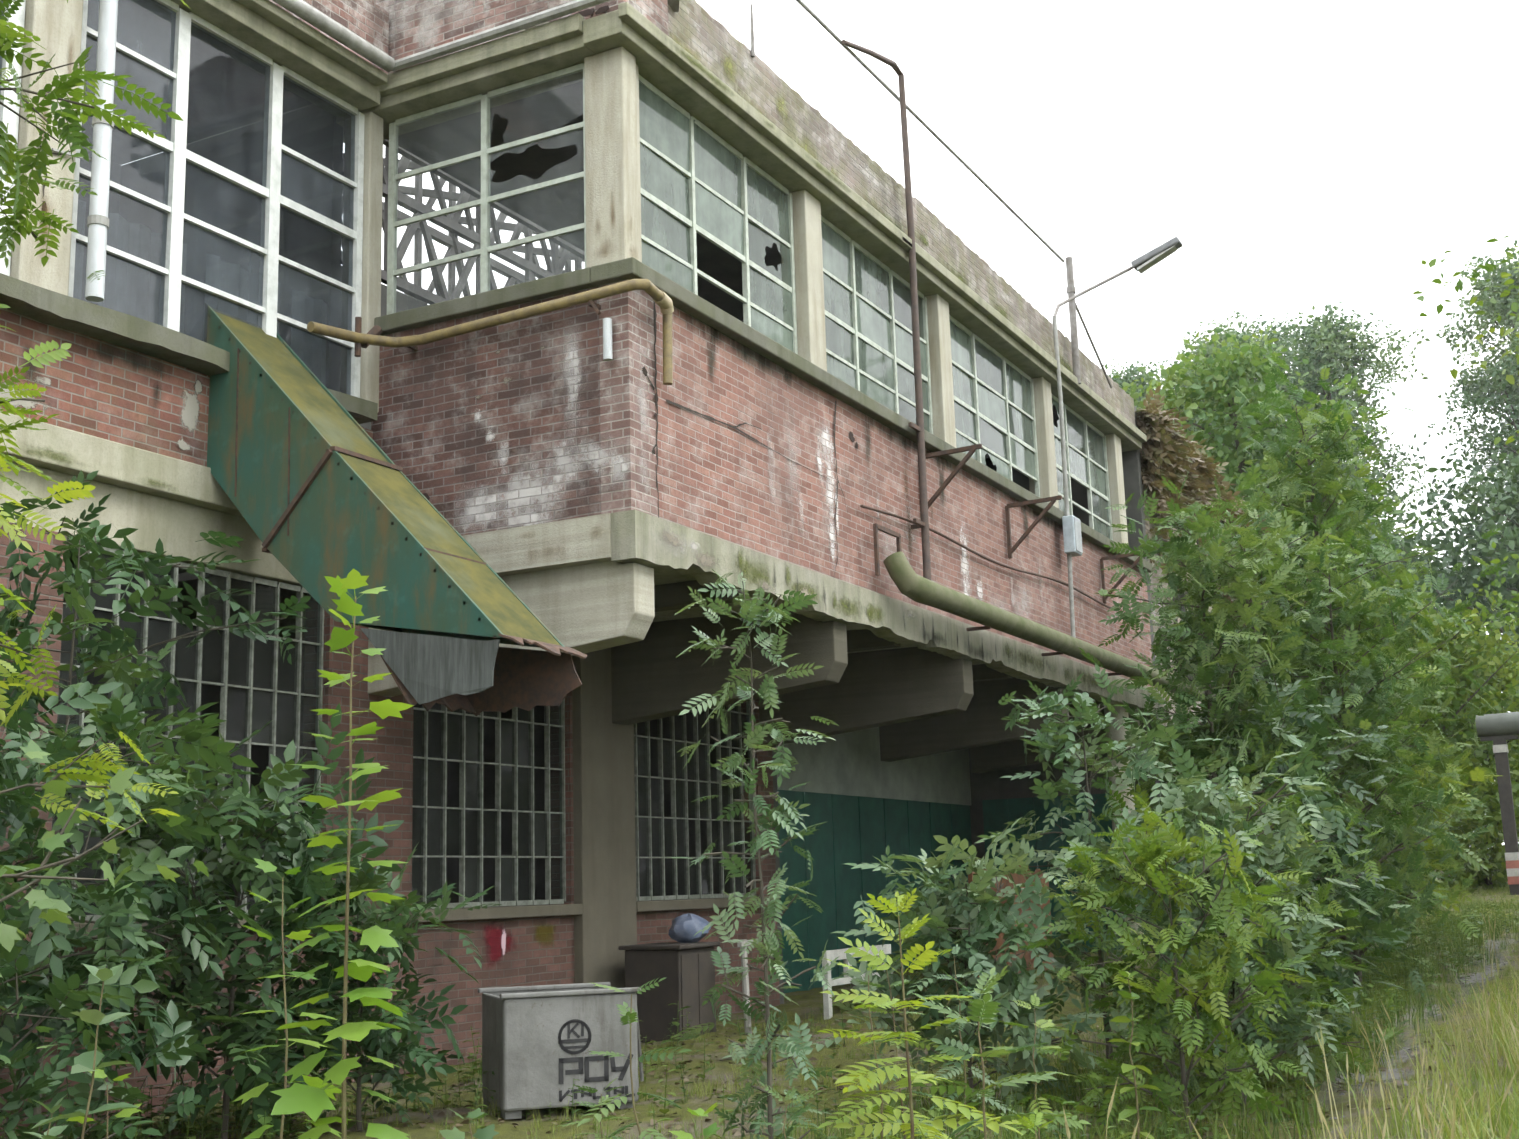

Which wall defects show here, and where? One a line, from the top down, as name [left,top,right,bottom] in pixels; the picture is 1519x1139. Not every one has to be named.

spalling [576,5,609,17]
leakage [566,351,578,401]
leakage [709,328,790,382]
leakage [467,443,627,526]
leakage [817,432,838,557]
leakage [867,426,948,501]
leakage [1024,506,1063,531]
leakage [960,530,982,598]
leakage [904,614,1010,659]